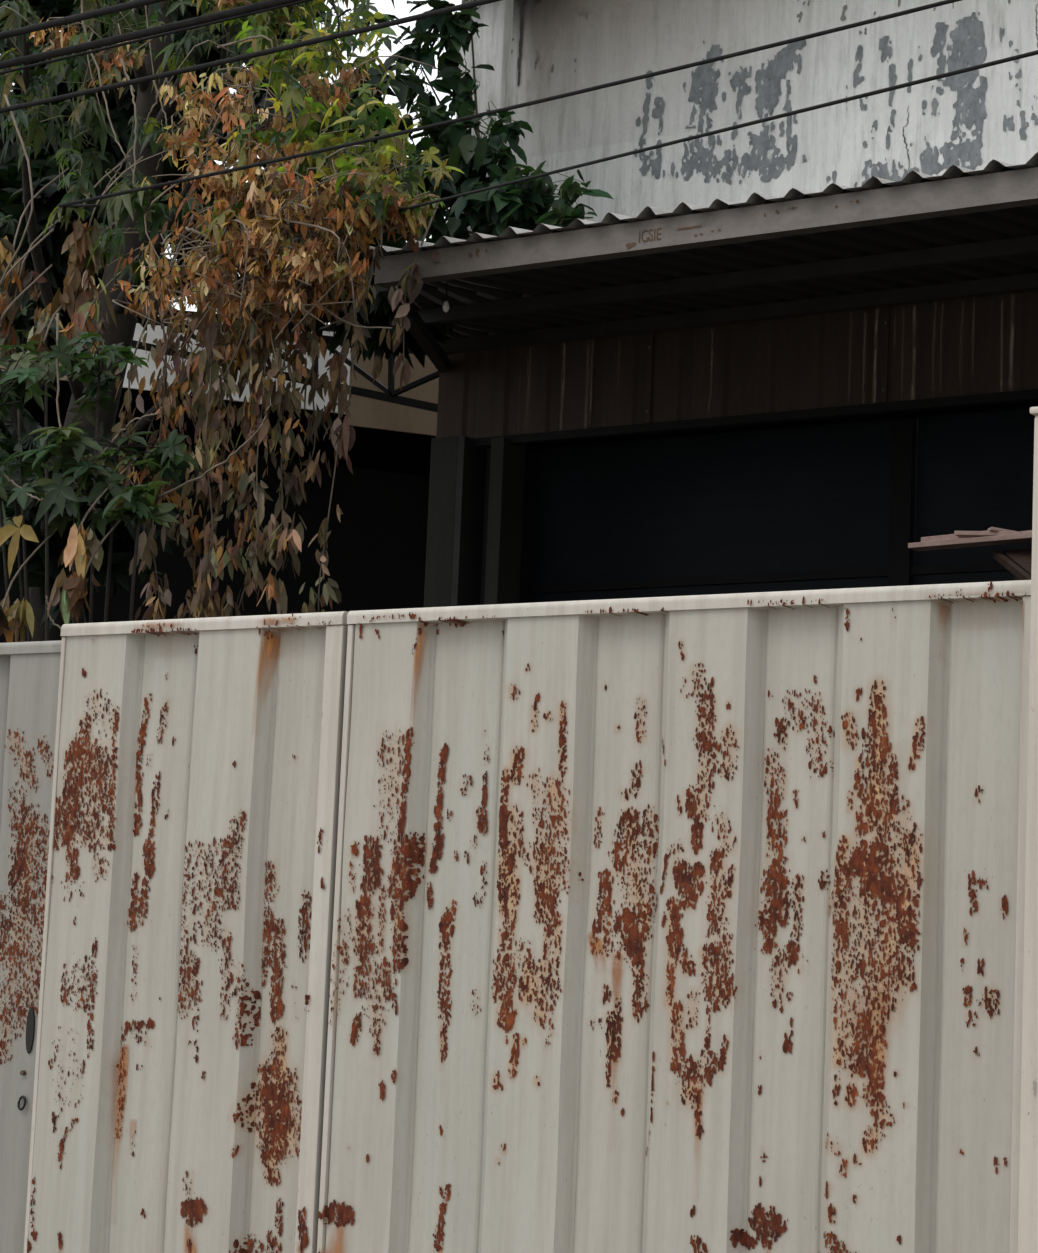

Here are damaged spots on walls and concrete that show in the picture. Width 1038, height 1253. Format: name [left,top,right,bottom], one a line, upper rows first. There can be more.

peeling [634,40,807,185]
peeling [846,12,1038,187]
corrosion [131,623,198,654]
corrosion [0,689,119,1064]
corrosion [48,937,98,1169]
corrosion [127,693,176,1001]
corrosion [178,811,325,1253]
corrosion [329,641,738,1140]
corrosion [755,675,925,1178]
corrosion [298,1199,355,1253]
corrosion [730,1202,788,1250]
corrosion [823,1181,857,1253]